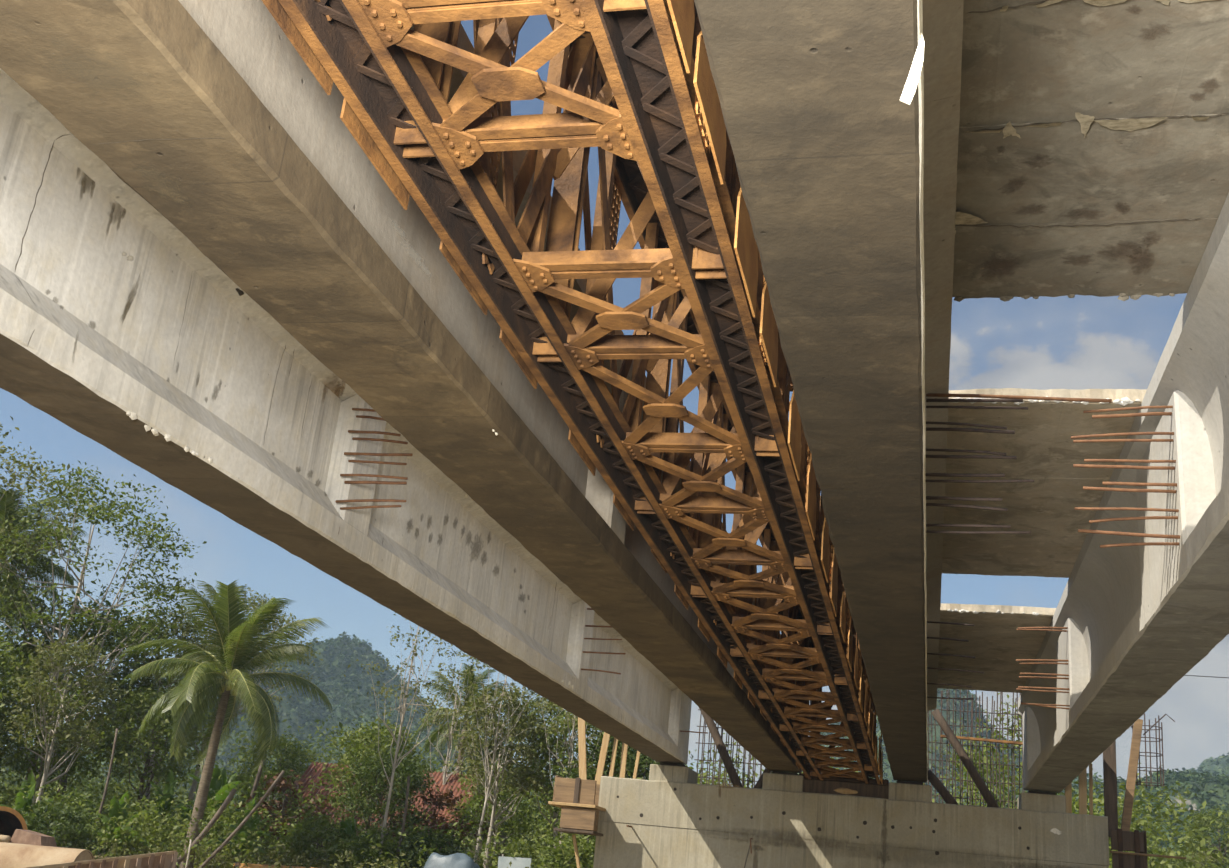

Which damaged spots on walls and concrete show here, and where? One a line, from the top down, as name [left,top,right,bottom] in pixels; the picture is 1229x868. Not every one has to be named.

peeling [1003,112,1167,139]
damp [78,168,94,195]
crack [15,134,70,344]